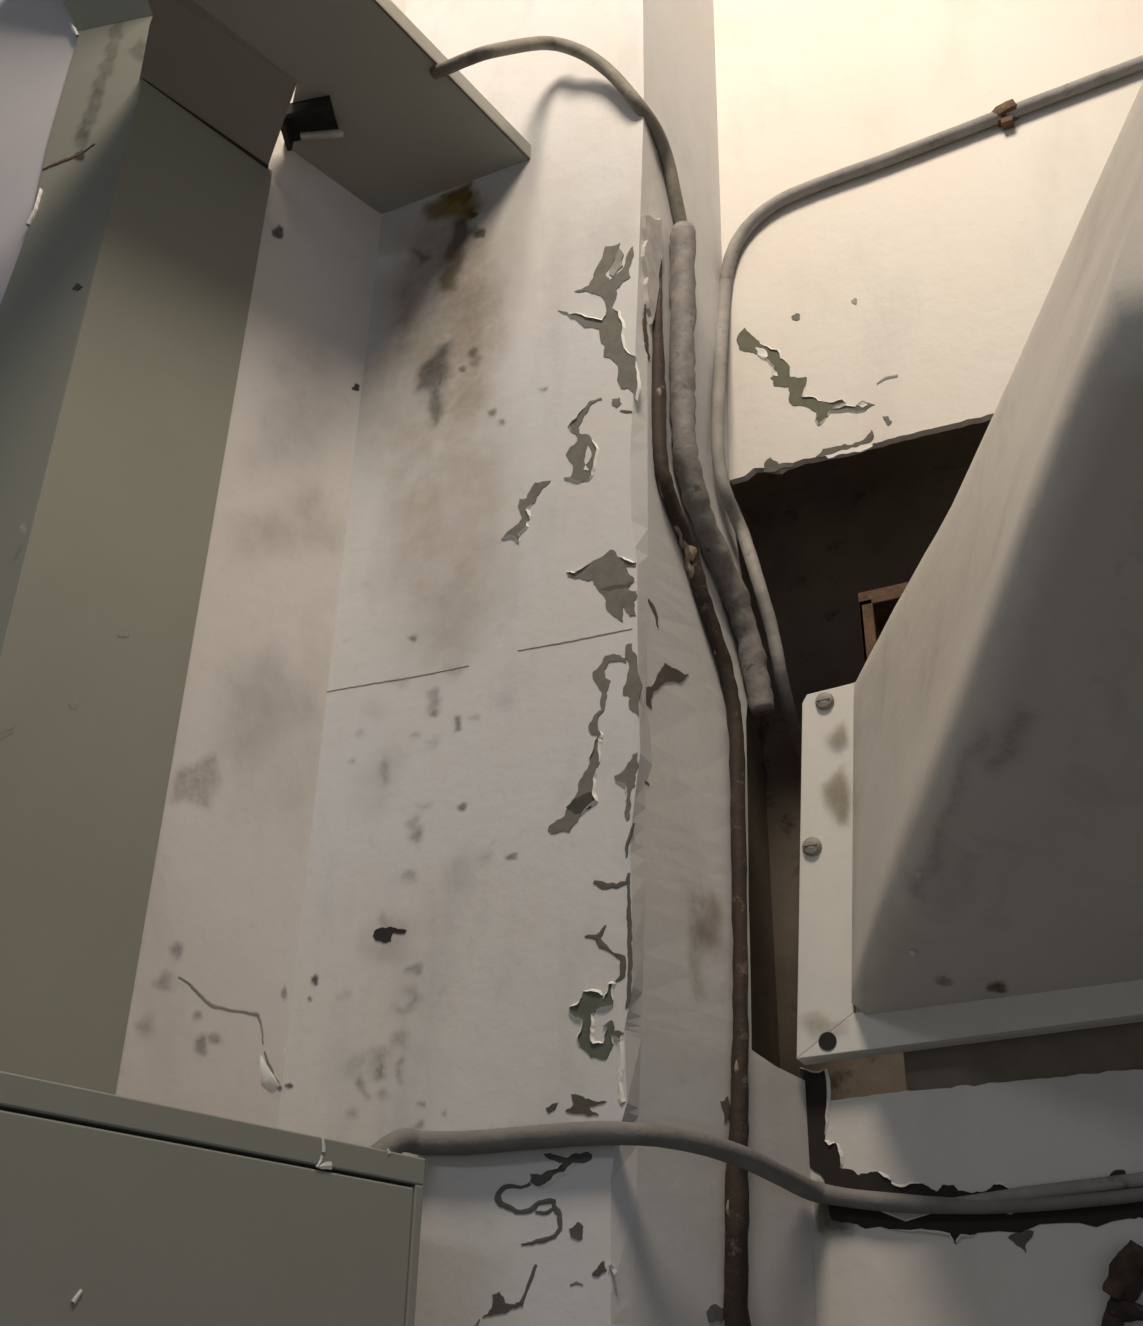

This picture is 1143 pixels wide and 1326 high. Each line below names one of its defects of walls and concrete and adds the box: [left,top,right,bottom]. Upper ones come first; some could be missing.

corrosion [428,184,470,217]
damp [440,217,485,290]
damp [421,346,446,412]
peeling [502,215,664,543]
peeling [736,328,892,459]
peeling [567,550,659,627]
peeling [548,643,688,834]
crack [178,976,264,1044]
peeling [546,981,626,1116]
spalling [800,1068,1011,1197]
peeling [494,1152,593,1245]
spalling [817,1202,1143,1253]